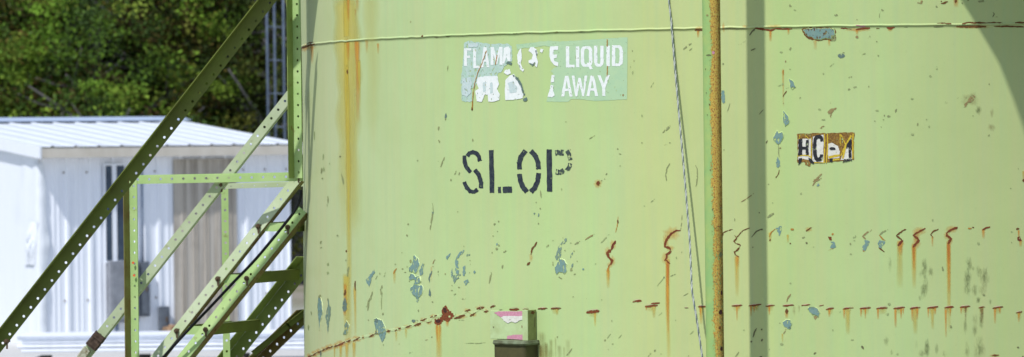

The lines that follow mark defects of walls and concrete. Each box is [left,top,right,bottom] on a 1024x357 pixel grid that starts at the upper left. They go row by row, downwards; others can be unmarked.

peeling [802,14,838,41]
rust [337,0,360,219]
rust [695,0,1003,357]
peeling [307,294,350,335]
peeling [366,271,386,345]
rust [308,304,561,357]
peeling [401,246,476,322]
peeling [546,238,596,279]